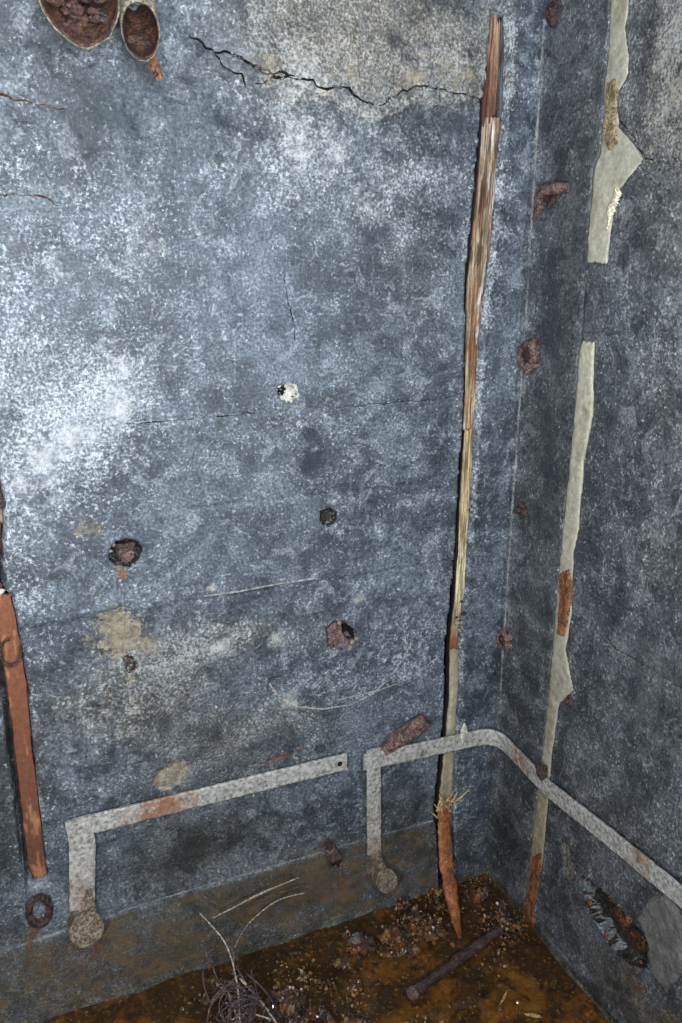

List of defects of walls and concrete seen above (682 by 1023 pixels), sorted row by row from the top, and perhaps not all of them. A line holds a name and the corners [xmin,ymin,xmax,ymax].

rust [150,56,164,81]
crack [185,32,480,106]
rust [544,194,558,209]
rust [517,337,540,375]
rust [557,569,573,636]
rust [0,580,48,879]
rust [522,852,542,928]
rust [581,876,649,970]
rust [406,925,504,1001]